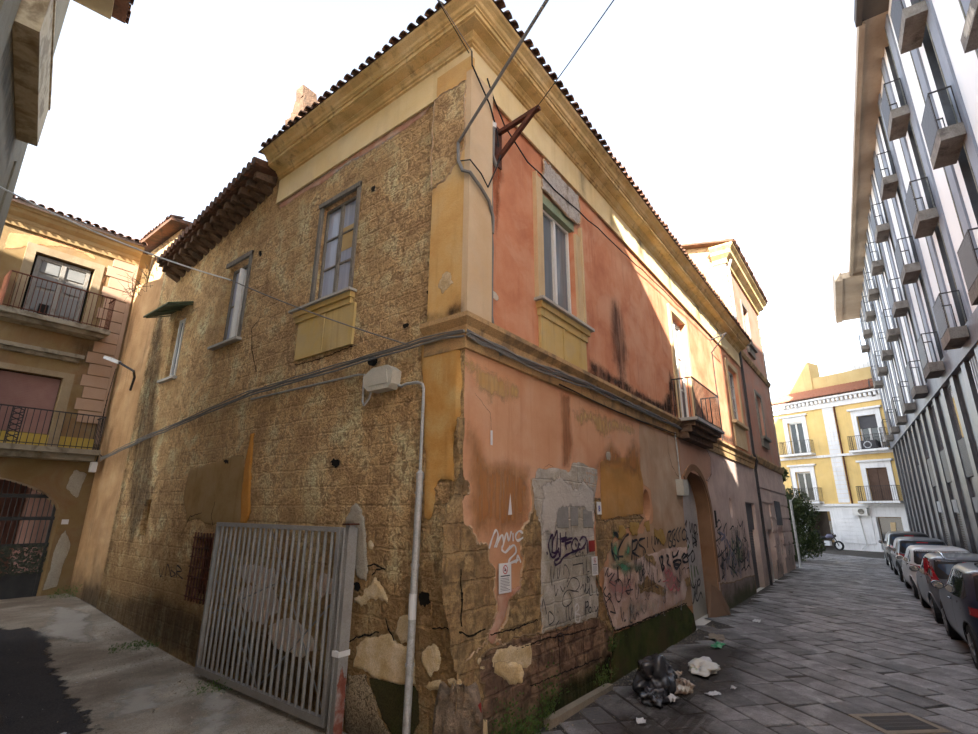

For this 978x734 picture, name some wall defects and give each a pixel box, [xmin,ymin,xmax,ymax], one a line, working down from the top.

water stain [591,304,678,414]
flaking render [66,470,87,497]
water stain [131,321,161,536]
flaking render [43,530,70,590]
water stain [83,590,322,702]
rust [333,667,347,734]
flaking render [345,468,666,734]